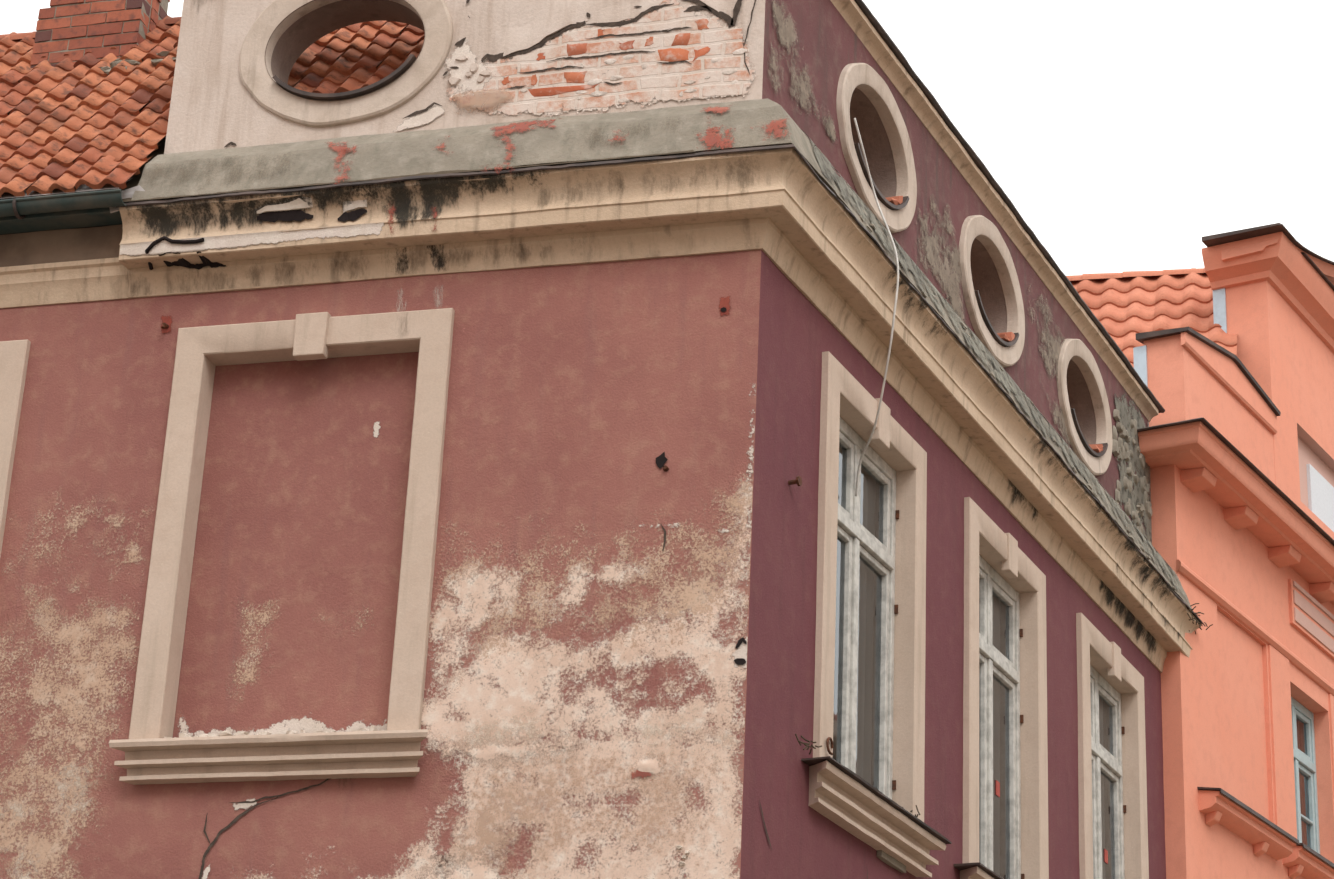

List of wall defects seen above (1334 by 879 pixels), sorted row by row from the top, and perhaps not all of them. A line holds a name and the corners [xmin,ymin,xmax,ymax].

spalling [394,0,836,141]
crack [481,0,756,74]
spalling [120,197,384,270]
damp [127,118,561,270]
damp [756,119,1188,638]
peeling [5,491,148,580]
peeling [358,383,756,879]
damp [1100,579,1156,652]
peeling [0,580,139,879]
spalling [177,716,387,737]
crack [199,778,332,879]